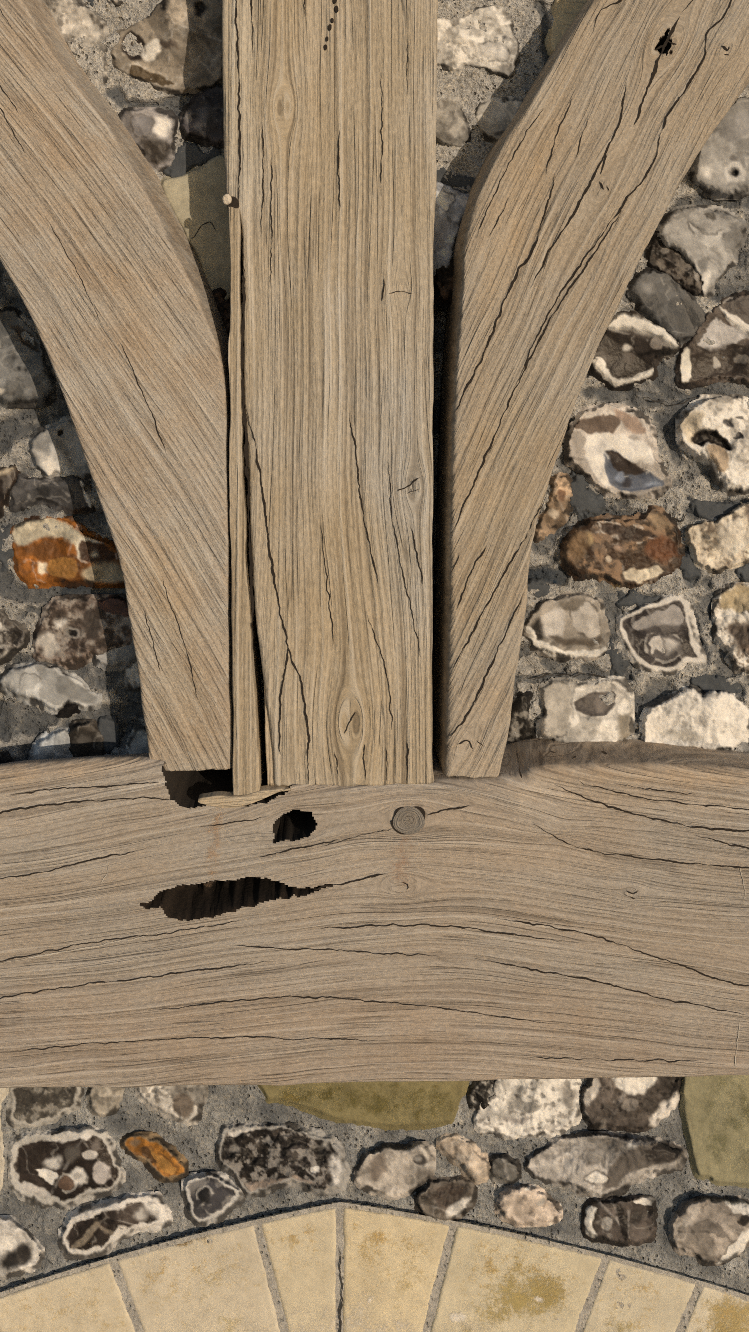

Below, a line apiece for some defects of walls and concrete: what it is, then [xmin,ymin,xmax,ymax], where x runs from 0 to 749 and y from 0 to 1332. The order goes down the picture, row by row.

crack [349,0,732,742]
crack [190,0,409,784]
crack [201,816,267,827]
crack [429,806,468,815]
crack [263,830,389,857]
crack [315,874,383,890]
crack [0,918,749,1053]
crack [532,1056,689,1064]